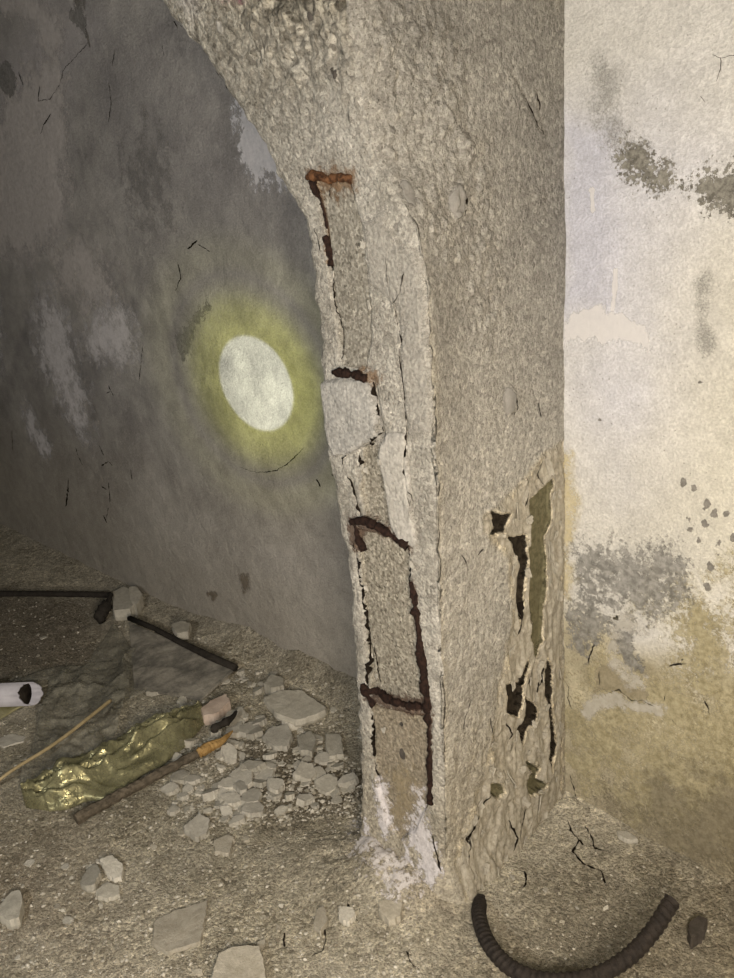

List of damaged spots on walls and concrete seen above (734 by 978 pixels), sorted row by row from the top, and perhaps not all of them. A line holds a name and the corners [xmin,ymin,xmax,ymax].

mould [605,119,734,223]
spalling [317,181,373,370]
spalling [361,441,428,840]
rust [363,686,435,756]
flaking render [452,441,566,900]
water stain [563,455,734,881]
water stain [347,766,444,903]